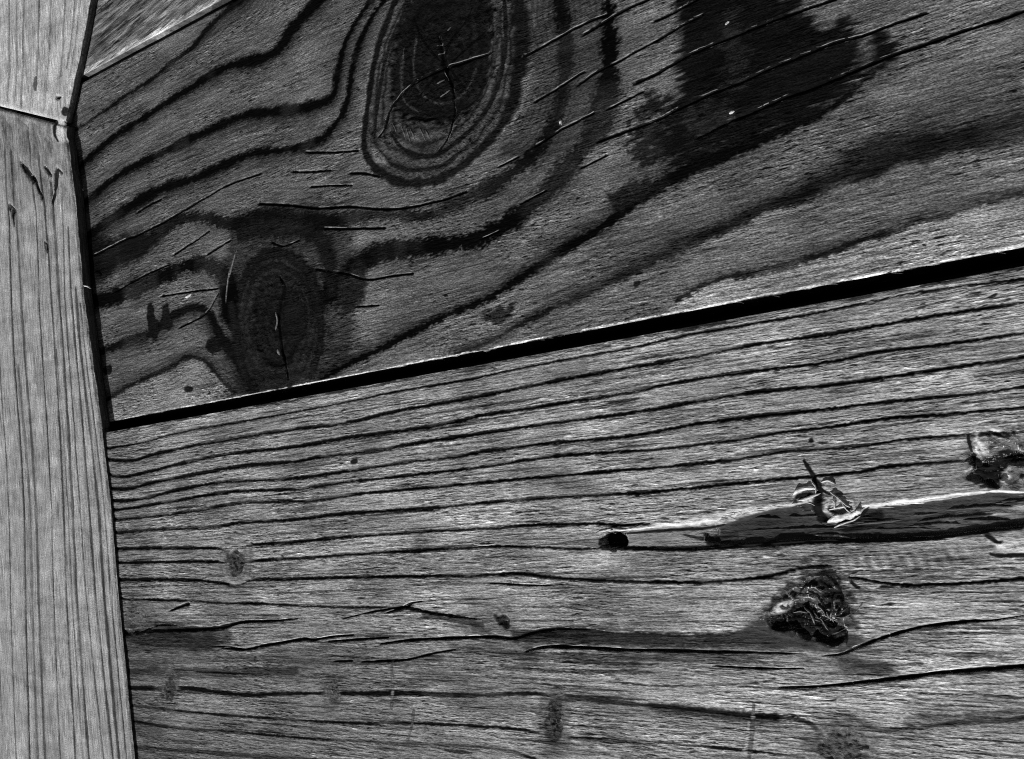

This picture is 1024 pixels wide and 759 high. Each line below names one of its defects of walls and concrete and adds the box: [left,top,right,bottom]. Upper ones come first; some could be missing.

damp [608,0,898,211]
crack [124,599,1024,688]